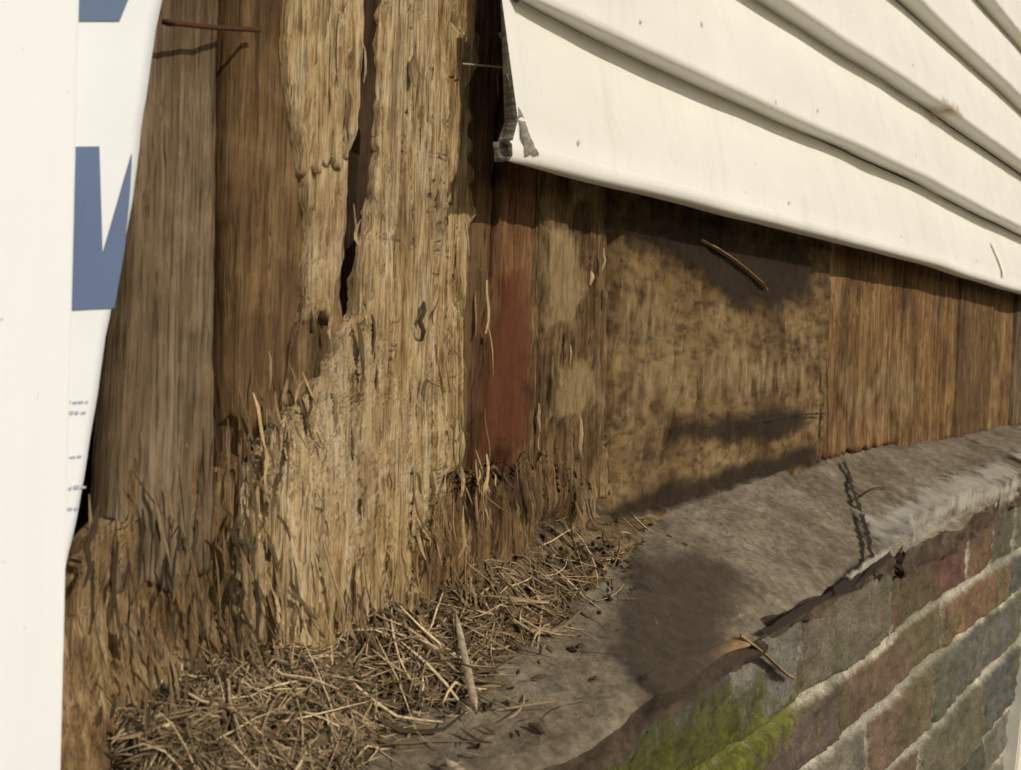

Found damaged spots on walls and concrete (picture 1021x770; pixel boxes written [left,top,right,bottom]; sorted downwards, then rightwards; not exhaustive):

damp [617,209,814,312]
damp [616,446,818,517]
damp [673,404,806,443]
crack [742,361,886,581]
damp [614,550,748,702]